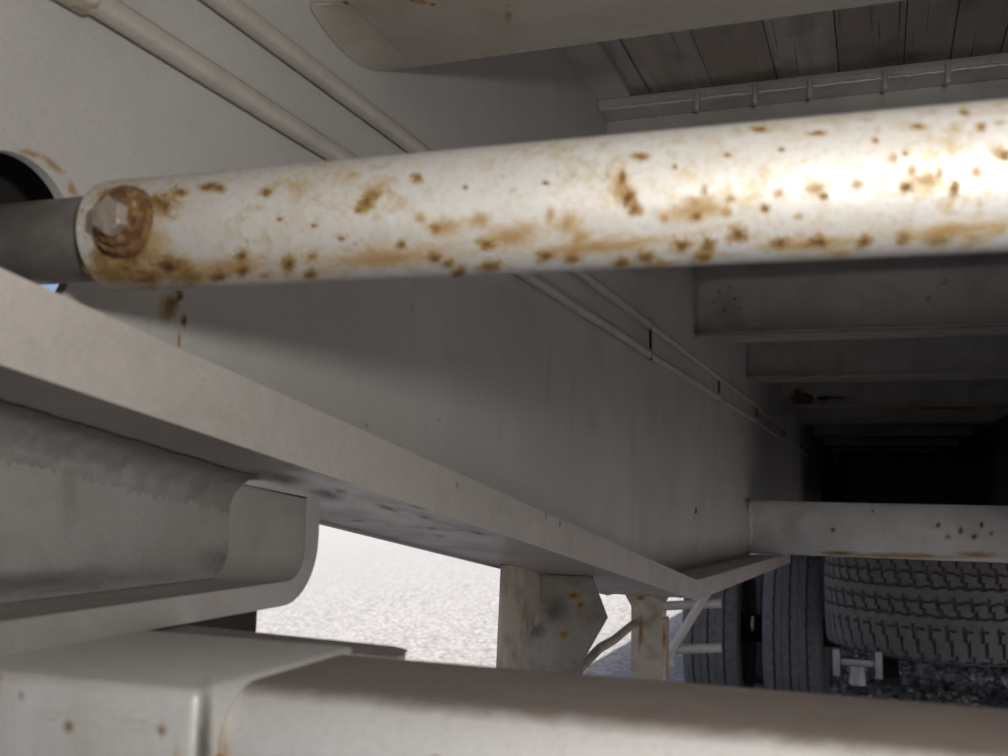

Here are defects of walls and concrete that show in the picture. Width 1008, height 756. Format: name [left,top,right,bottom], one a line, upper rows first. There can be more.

rust [992,146,1008,162]
rust [149,182,227,217]
rust [354,187,382,214]
rust [614,170,643,215]
rust [900,166,960,198]
rust [281,252,318,280]
rust [336,225,532,277]
rust [536,208,671,269]
rust [661,186,749,262]
rust [770,233,874,256]
rust [896,224,999,246]
rust [88,230,269,345]